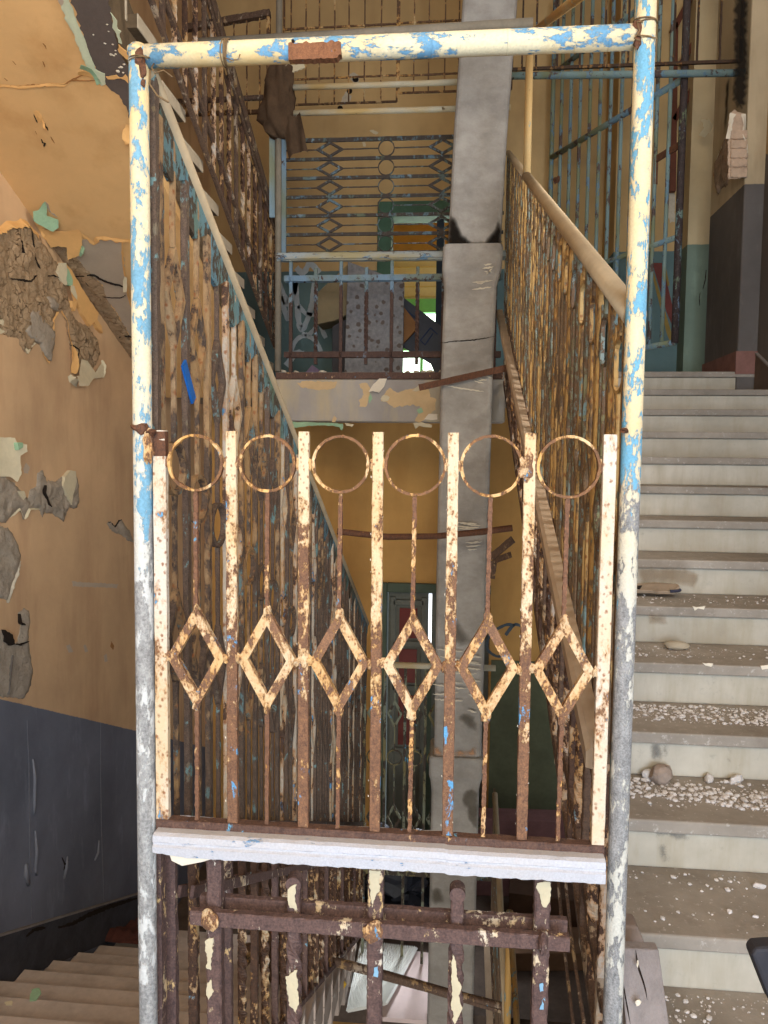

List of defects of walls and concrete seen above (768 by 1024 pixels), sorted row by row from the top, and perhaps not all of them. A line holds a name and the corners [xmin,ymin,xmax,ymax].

flaking render [0,202,132,387]
peeling [298,381,337,390]
peeling [292,416,354,430]
peeling [359,379,437,429]
flaking render [0,437,79,603]
flaking render [0,608,33,699]